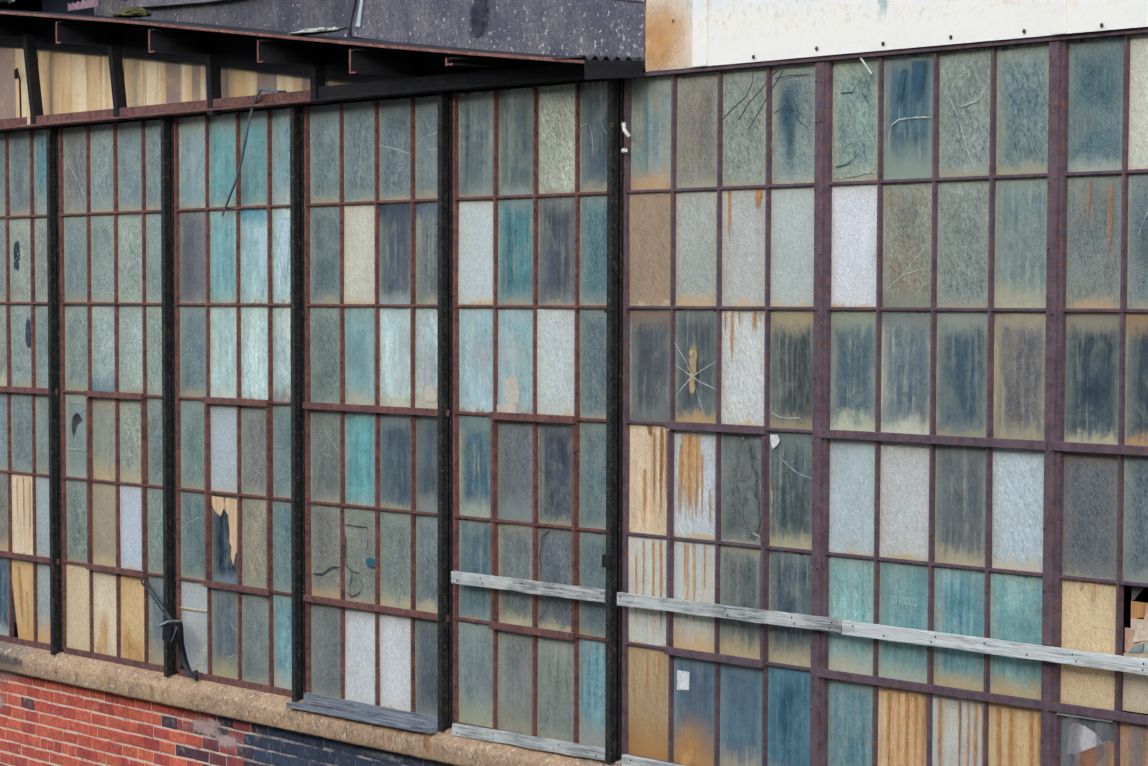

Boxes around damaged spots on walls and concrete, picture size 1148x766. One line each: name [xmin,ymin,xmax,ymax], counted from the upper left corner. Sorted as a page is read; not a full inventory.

corrosion [645,7,680,68]
corrosion [724,310,760,356]
corrosion [643,426,711,522]
corrosion [887,693,941,766]
corrosion [958,703,1013,766]
corrosion [1029,714,1041,766]